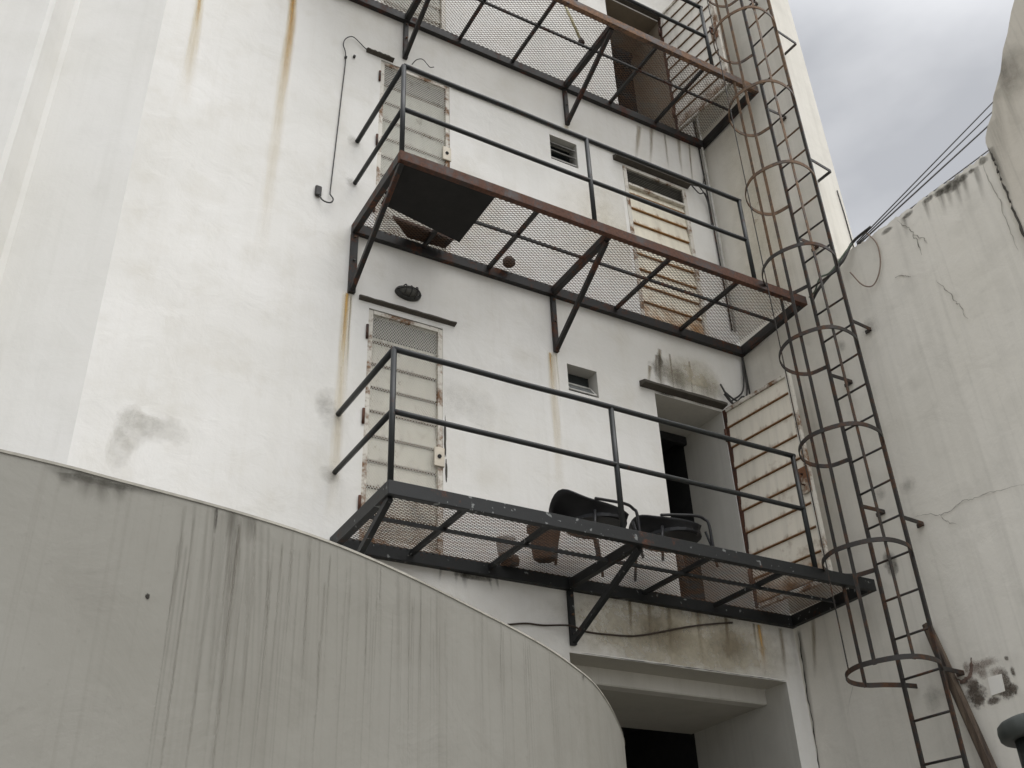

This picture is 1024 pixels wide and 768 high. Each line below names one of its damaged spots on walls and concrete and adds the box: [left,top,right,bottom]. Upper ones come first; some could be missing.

crack [895,222,925,278]
damp [76,471,141,488]
crack [921,485,1018,524]